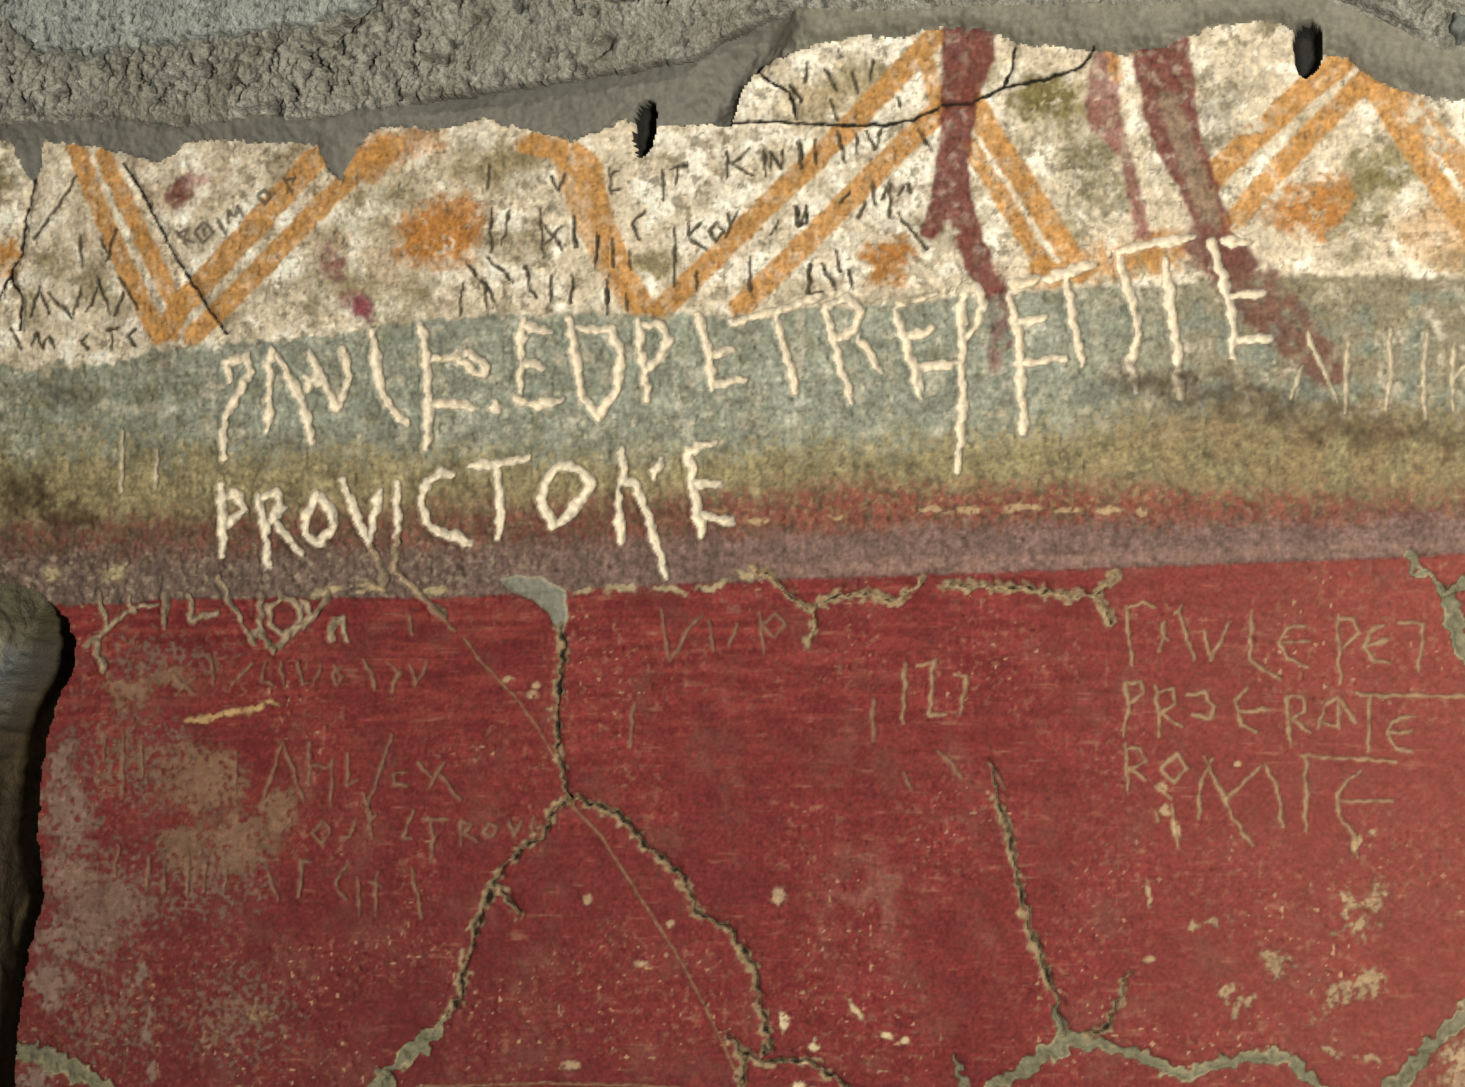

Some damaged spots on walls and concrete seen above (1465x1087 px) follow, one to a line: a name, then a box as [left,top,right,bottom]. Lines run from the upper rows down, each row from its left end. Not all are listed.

spalling [1293,23,1323,79]
hole [632,100,658,158]
peeling [1406,95,1451,153]
peeling [310,582,389,599]
peeling [574,569,754,596]
crack [749,564,1122,648]
crack [1403,550,1465,665]
spalling [0,564,299,1087]
crack [367,623,850,1087]
crack [953,763,1329,1087]
crack [16,1040,114,1087]
crack [1381,998,1465,1087]